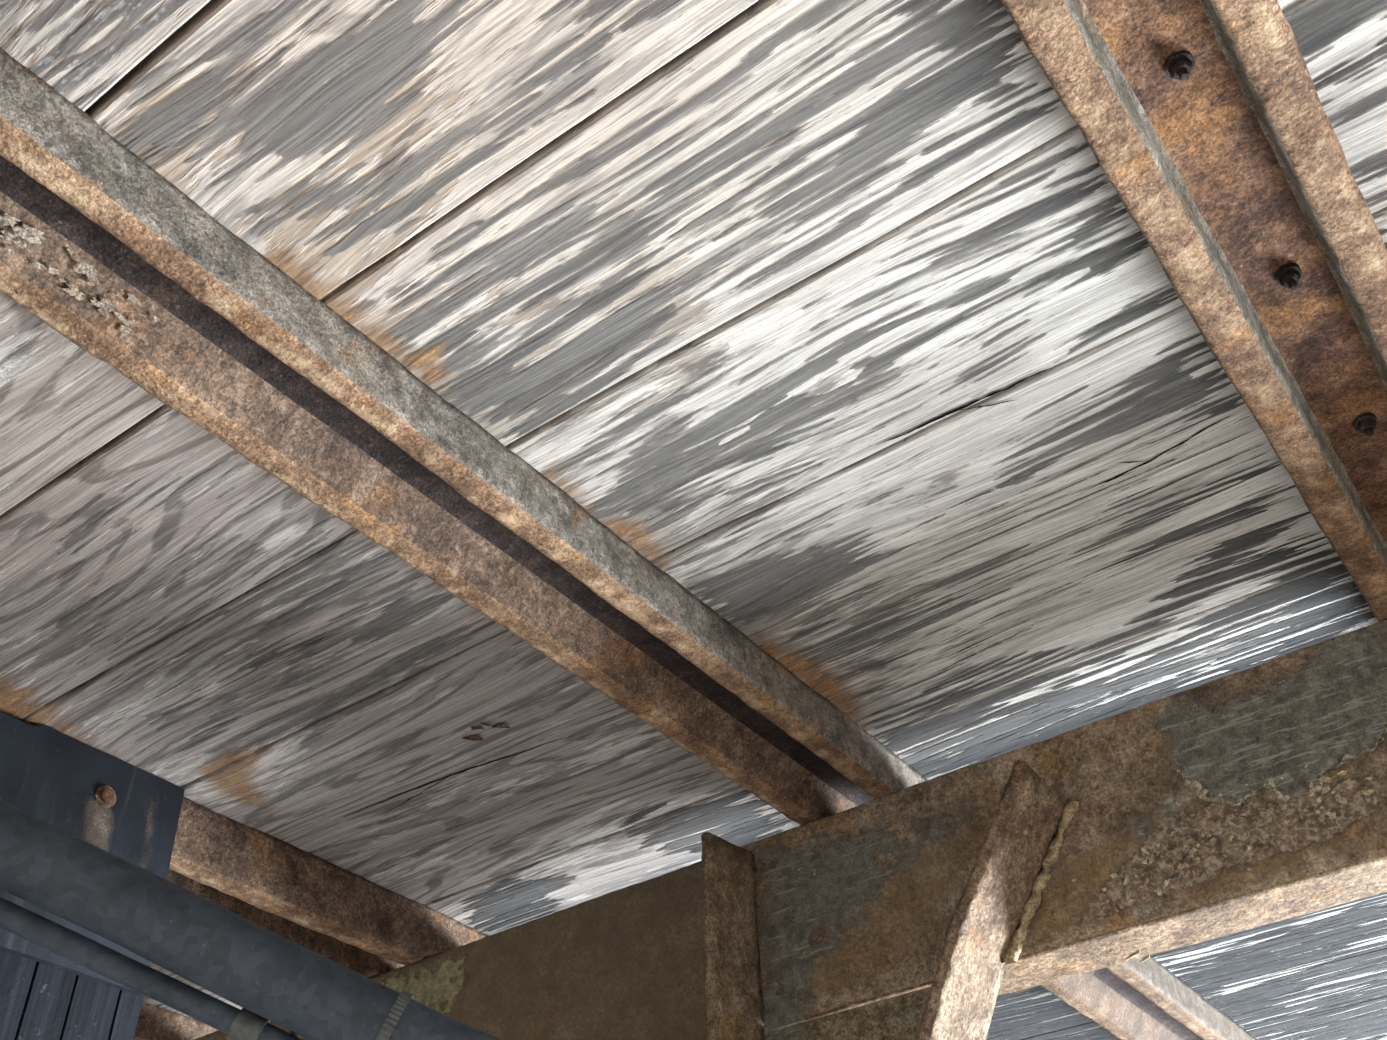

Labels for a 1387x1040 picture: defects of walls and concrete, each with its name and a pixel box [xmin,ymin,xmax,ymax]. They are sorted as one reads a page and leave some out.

peeling [0,212,161,333]
peeling [659,333,1387,806]
rust [0,676,54,723]
rust [761,642,858,717]
rust [1079,762,1383,923]
rust [1125,949,1150,962]